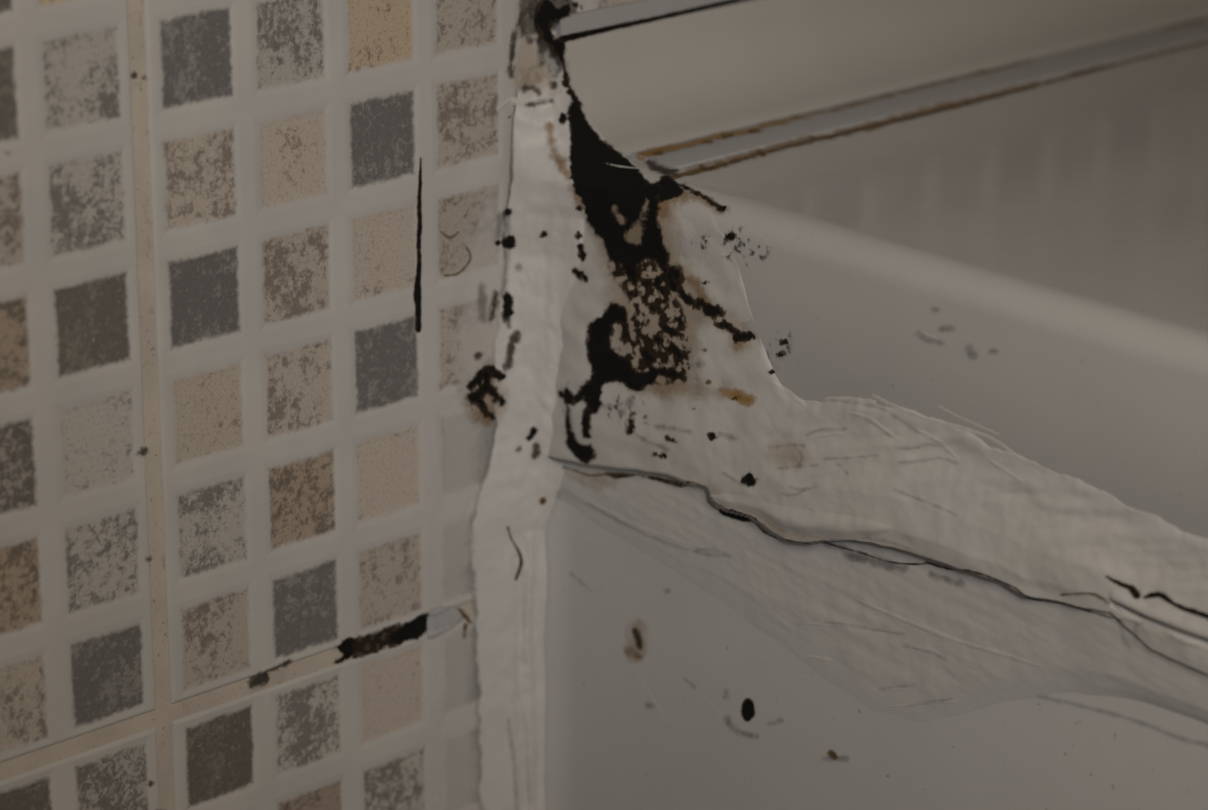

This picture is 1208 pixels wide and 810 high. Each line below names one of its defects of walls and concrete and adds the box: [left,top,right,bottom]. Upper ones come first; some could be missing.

crack [413,158,472,333]
leakage [495,235,516,249]
leakage [508,0,756,465]
leakage [724,230,763,259]
leakage [466,291,520,423]
peeling [698,492,894,540]
crack [563,467,1208,619]
spalling [741,698,755,721]